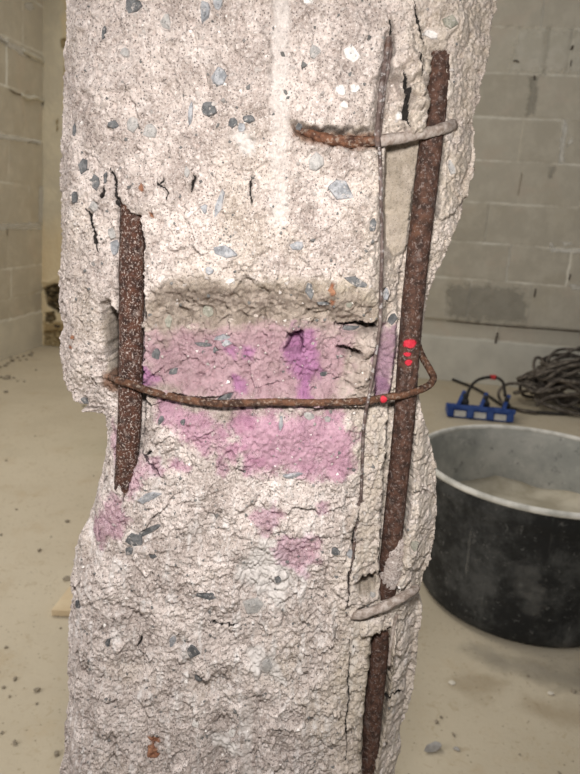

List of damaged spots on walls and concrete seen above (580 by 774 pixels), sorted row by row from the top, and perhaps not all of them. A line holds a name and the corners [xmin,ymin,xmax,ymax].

spalling [426,50,450,127]
crack [85,167,121,252]
rust [103,366,119,392]
spalling [114,199,373,496]
spalling [378,135,444,601]
crack [347,509,360,605]
crack [343,639,351,765]
spalling [361,627,390,774]